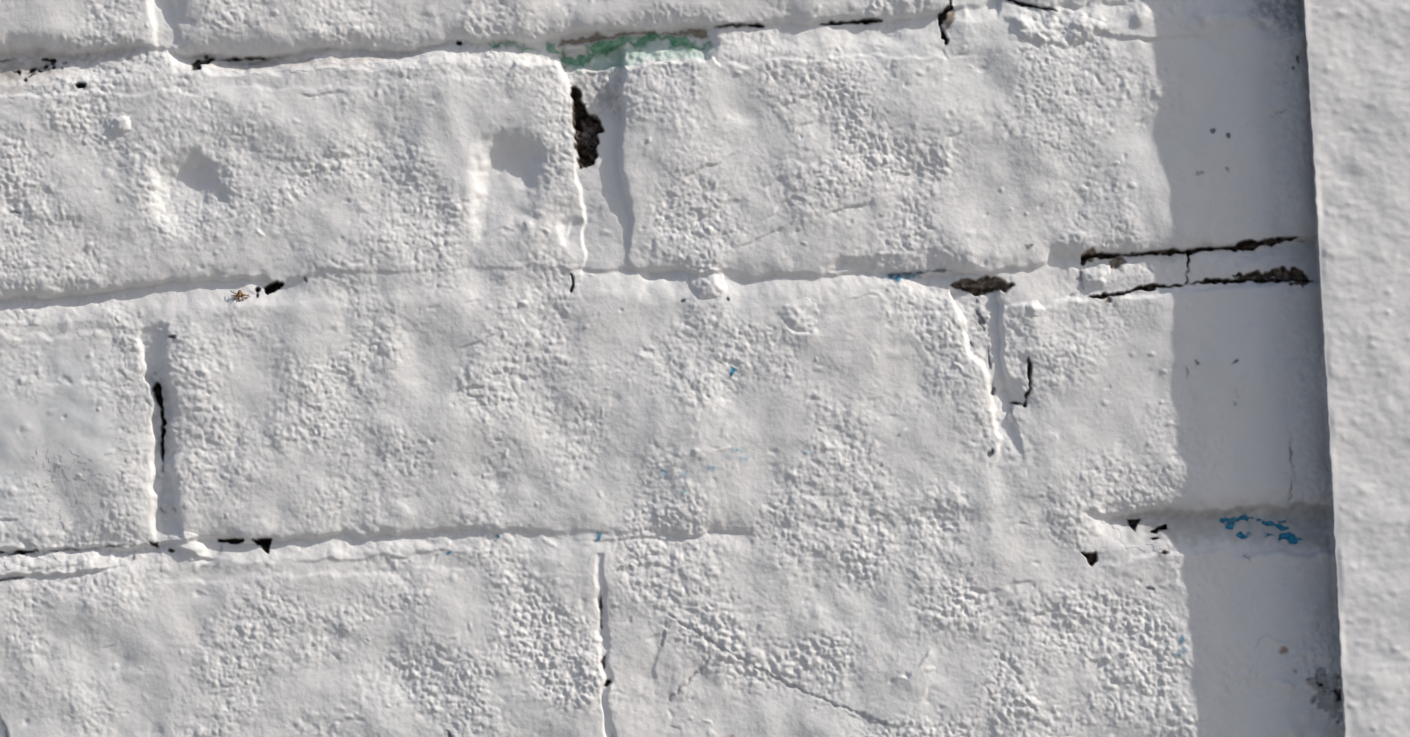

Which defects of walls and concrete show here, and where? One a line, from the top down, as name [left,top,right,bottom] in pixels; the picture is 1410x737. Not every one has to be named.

spalling [559,29,708,47]
crack [938,0,953,45]
spalling [568,67,625,169]
crack [1076,237,1310,299]
crack [886,266,1032,407]
crack [153,383,167,460]
peeling [1220,515,1301,544]
crack [0,550,38,581]
crack [600,600,611,686]